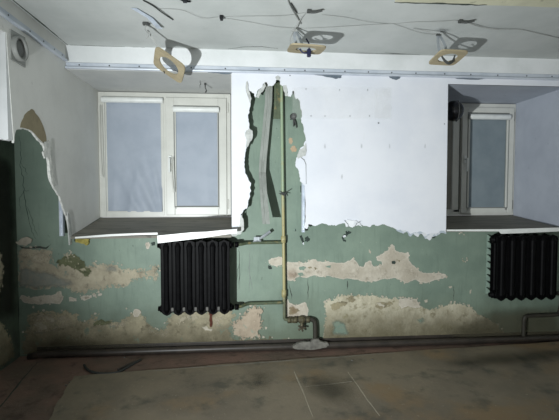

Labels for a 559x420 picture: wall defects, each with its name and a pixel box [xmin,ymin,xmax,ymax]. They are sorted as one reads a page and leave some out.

peeling [20,109,47,142]
crack [19,139,50,249]
peeling [268,244,448,284]
peeling [17,246,273,354]
peeling [323,293,489,338]